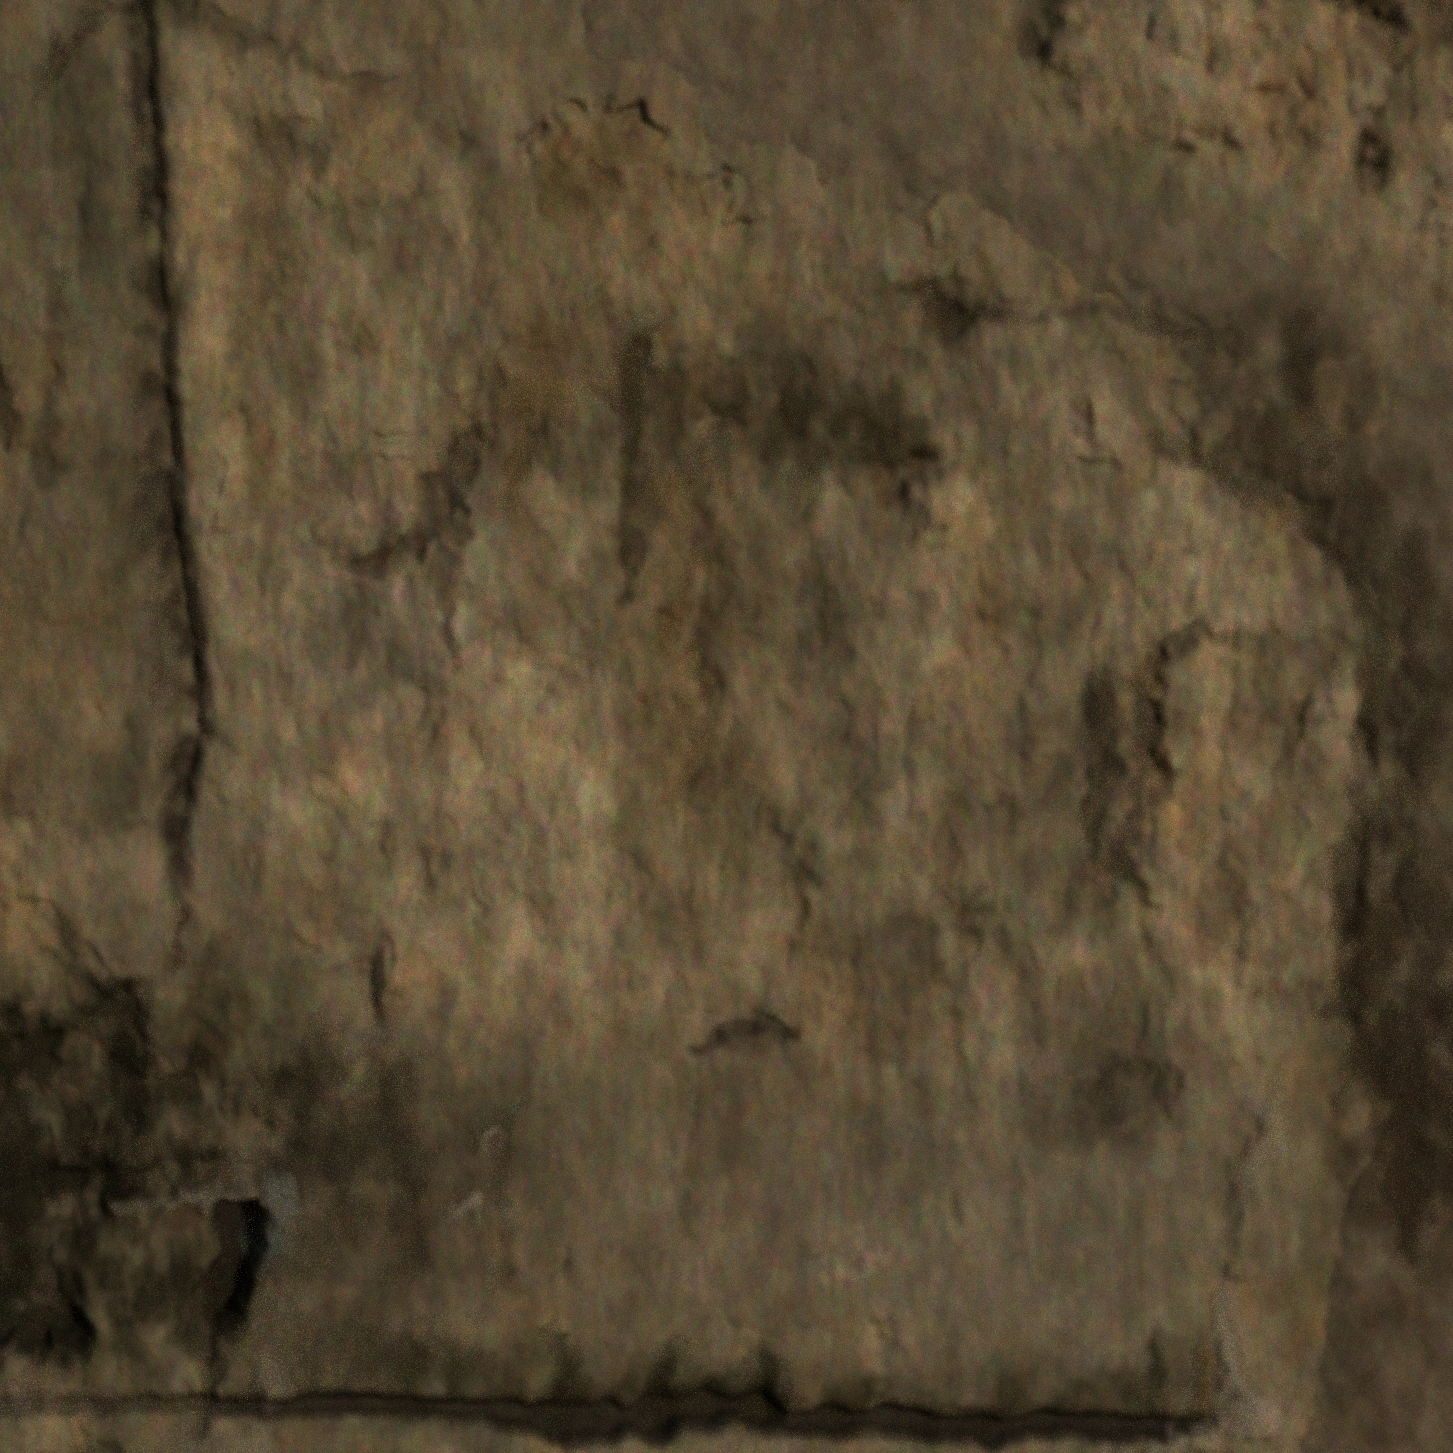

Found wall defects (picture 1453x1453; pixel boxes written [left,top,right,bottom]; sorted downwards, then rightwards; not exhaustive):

crack [128,2,152,125]
crack [146,263,166,314]
crack [143,372,201,861]
crack [209,1386,1207,1447]